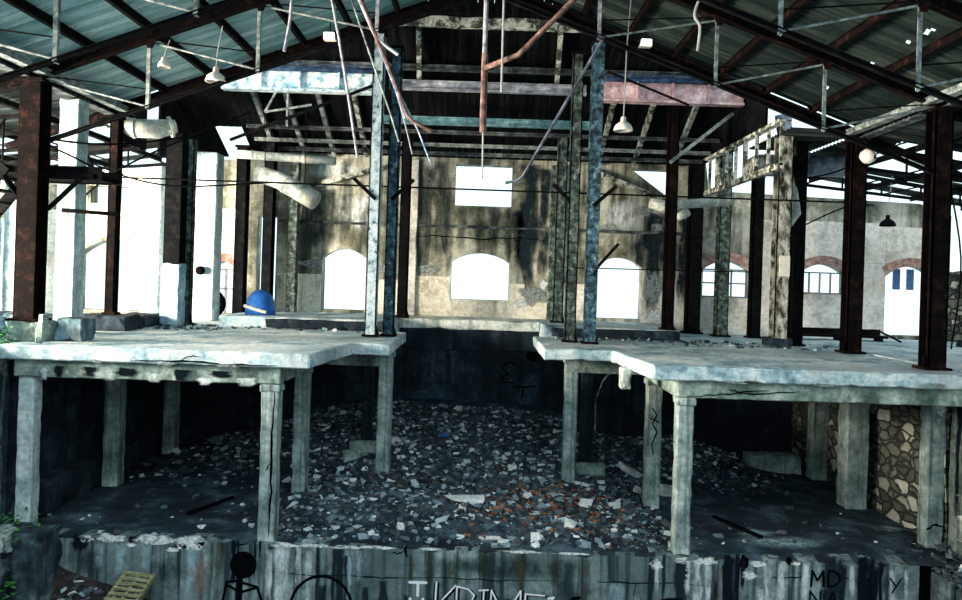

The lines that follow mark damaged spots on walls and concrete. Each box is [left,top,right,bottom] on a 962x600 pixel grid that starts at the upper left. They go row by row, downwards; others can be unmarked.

leakage [418,163,551,284]
spalling [0,359,8,376]
spalling [947,407,962,560]
leakage [72,535,97,569]
leakage [117,536,146,564]
peeling [81,533,206,552]
leakage [174,540,213,589]
leakage [647,554,745,600]
leakage [822,556,908,600]